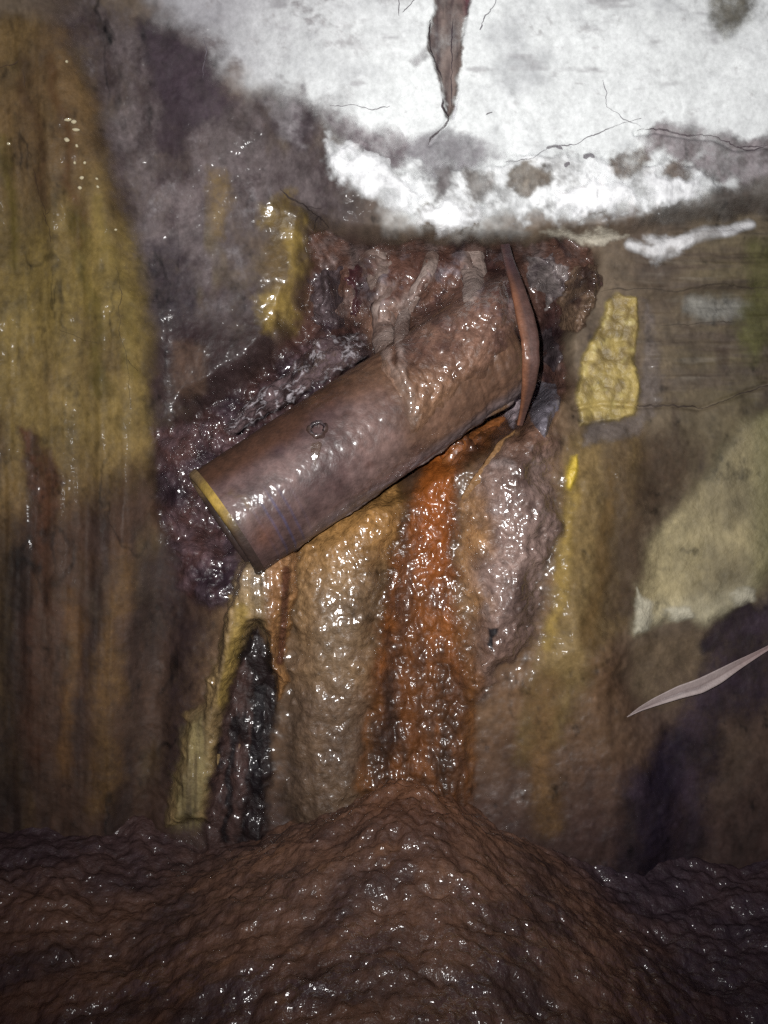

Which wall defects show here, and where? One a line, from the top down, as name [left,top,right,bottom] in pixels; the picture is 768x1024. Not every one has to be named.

damp [711,0,750,31]
spalling [428,0,470,142]
crack [506,82,766,167]
damp [326,133,768,233]
damp [549,227,618,245]
damp [626,220,755,259]
damp [685,298,746,320]
damp [0,0,370,837]
rust [357,416,518,807]
damp [524,293,687,831]
damp [618,603,768,876]